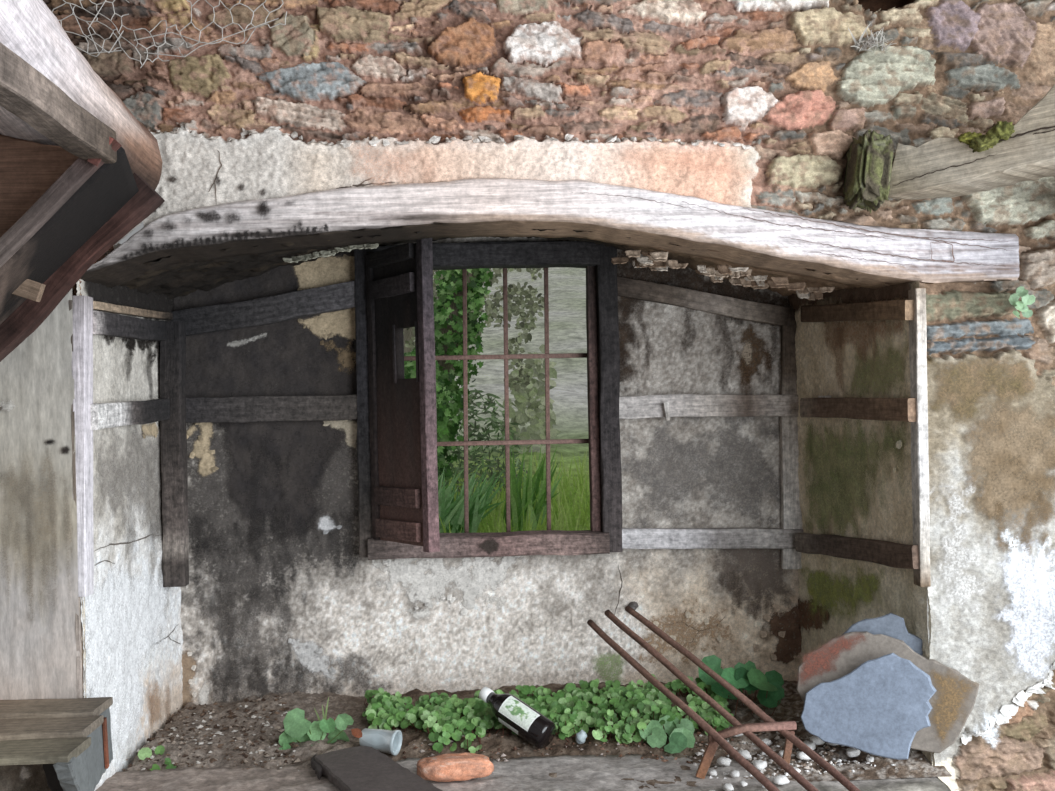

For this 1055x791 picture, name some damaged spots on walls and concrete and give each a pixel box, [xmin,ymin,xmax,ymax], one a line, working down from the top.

peeling [298,308,356,371]
peeling [187,422,219,476]
leakage [927,356,1055,678]
leakage [202,583,306,702]
leakage [984,713,998,745]
spalling [961,661,1055,745]